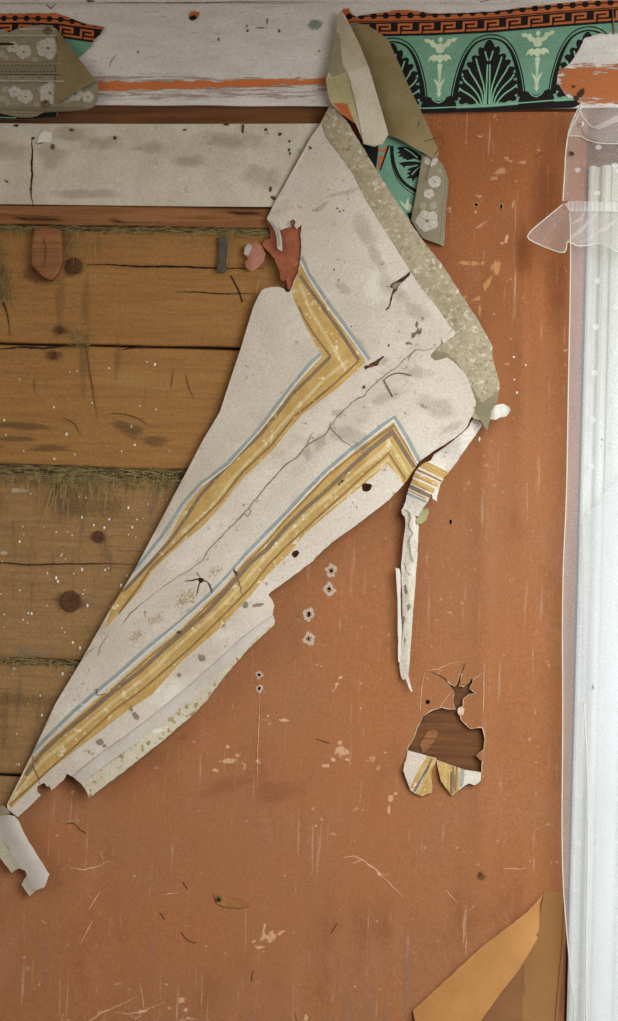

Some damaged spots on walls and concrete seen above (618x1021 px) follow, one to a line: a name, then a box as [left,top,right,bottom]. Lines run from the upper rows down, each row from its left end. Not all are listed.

peeling [558,63,618,105]
crack [30,130,52,207]
crack [87,264,264,295]
crack [0,284,147,435]
peeling [7,11,511,817]
crack [83,347,437,659]